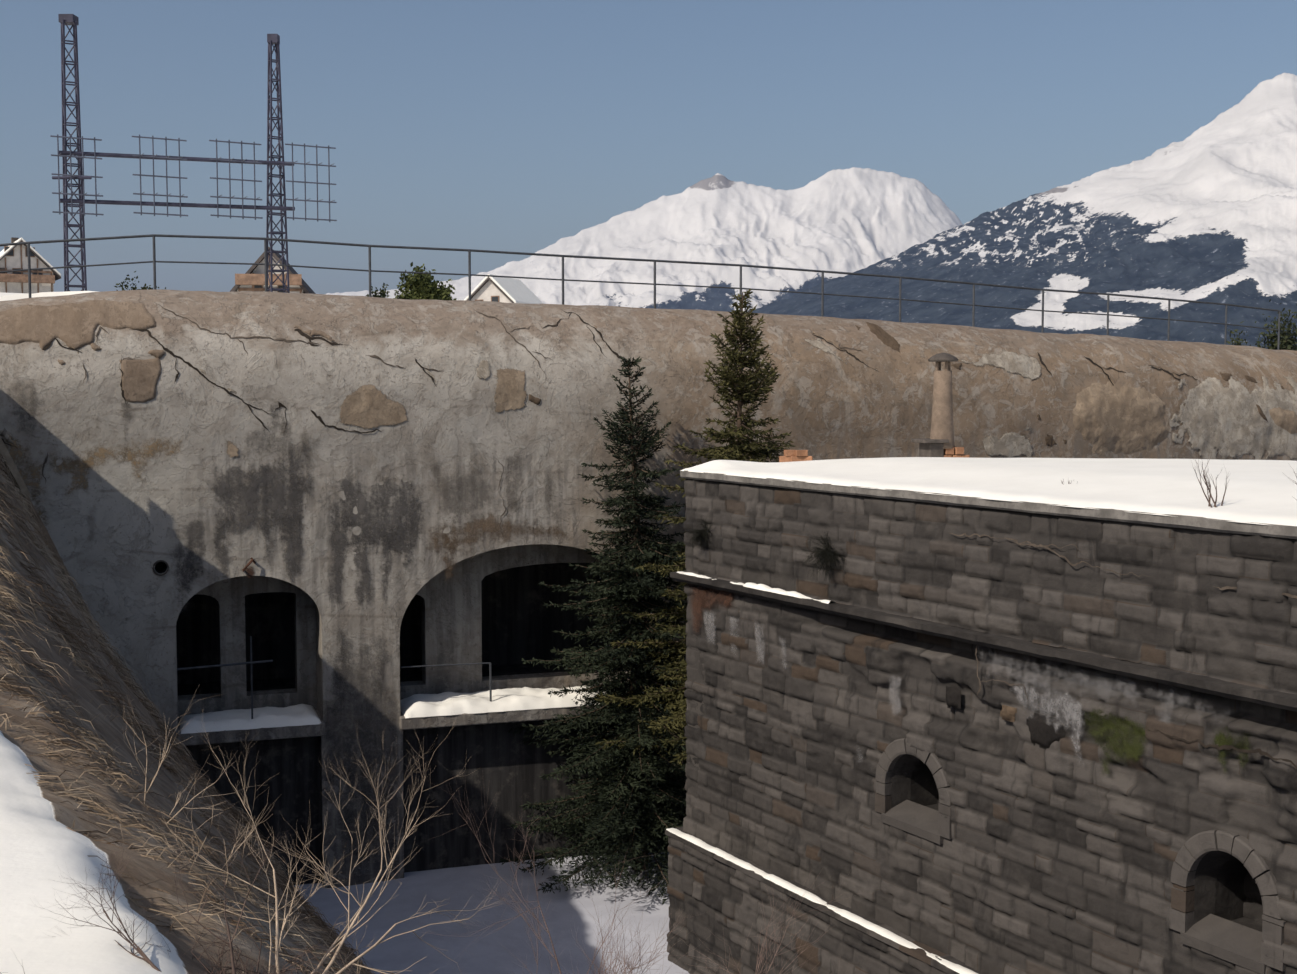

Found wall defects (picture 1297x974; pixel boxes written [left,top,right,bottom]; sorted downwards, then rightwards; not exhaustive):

crack [43,304,438,435]
crack [473,309,627,379]
crack [1084,356,1198,386]
water stain [175,449,312,591]
spalling [1000,705,1065,749]
water stain [1014,686,1081,752]